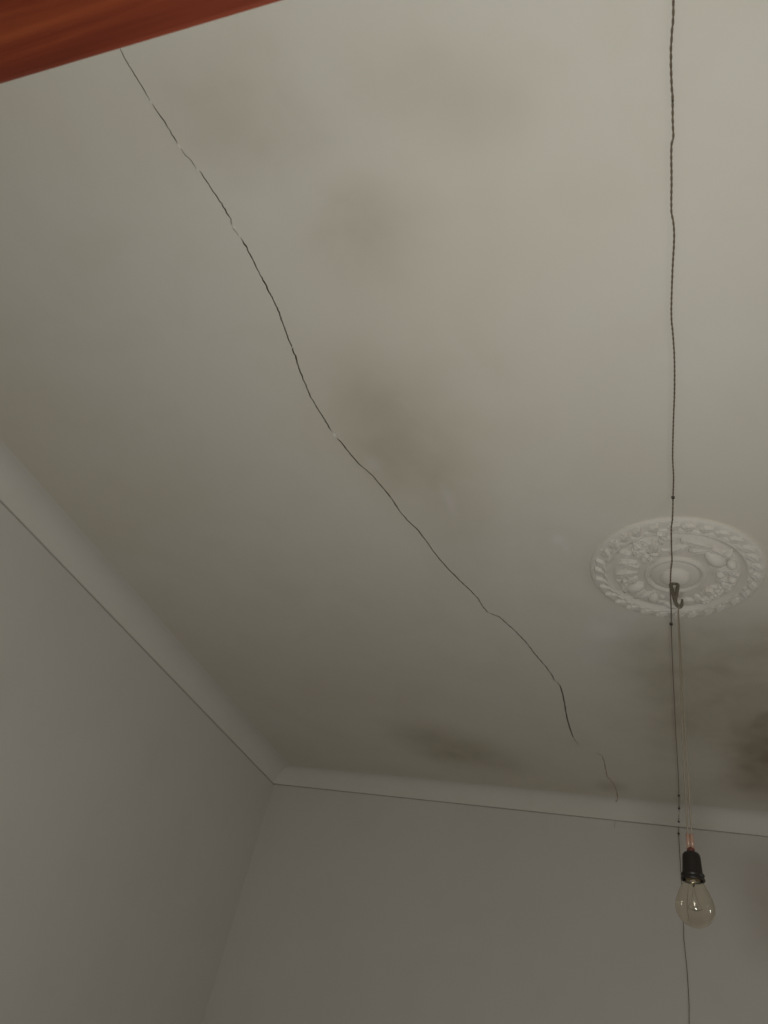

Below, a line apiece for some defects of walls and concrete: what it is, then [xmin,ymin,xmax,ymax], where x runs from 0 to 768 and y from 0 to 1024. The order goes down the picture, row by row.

crack [120,49,618,828]